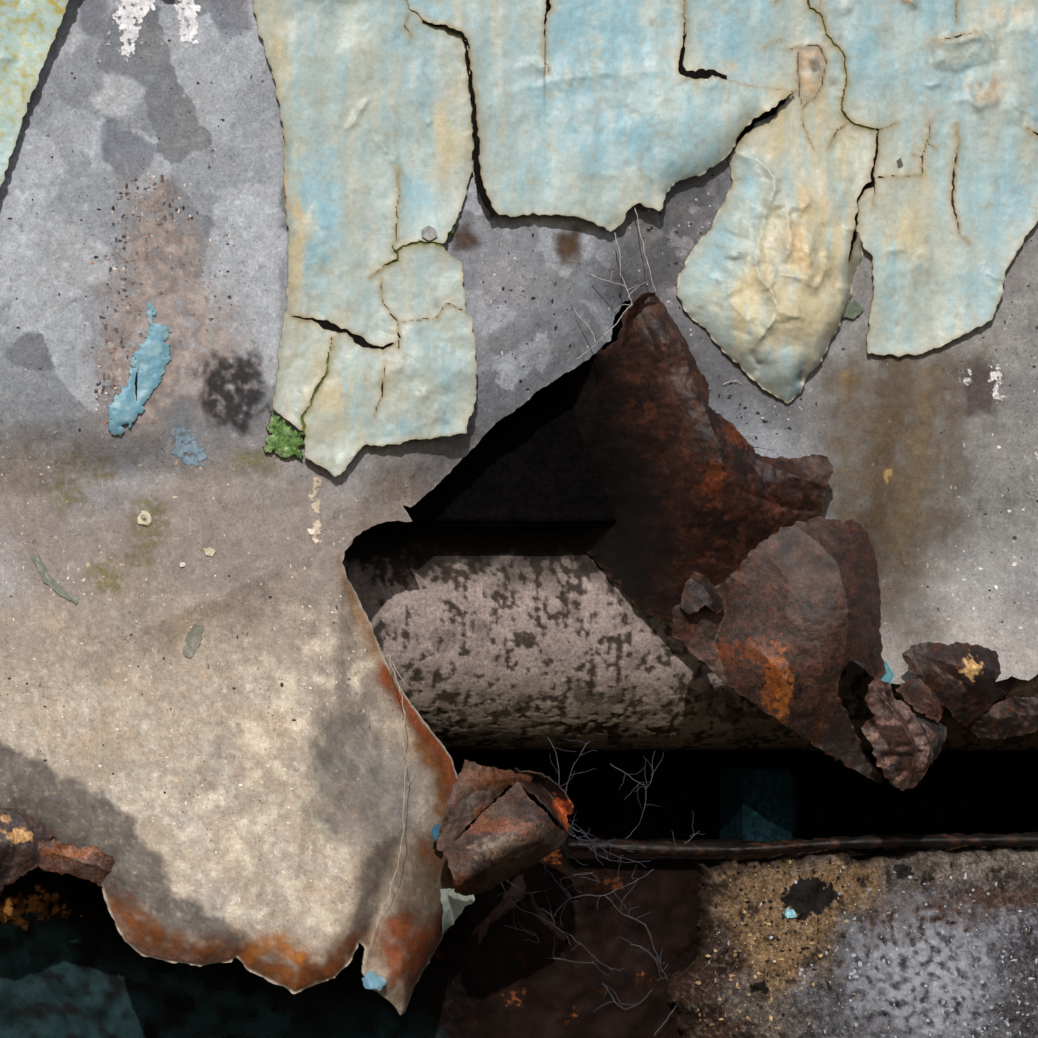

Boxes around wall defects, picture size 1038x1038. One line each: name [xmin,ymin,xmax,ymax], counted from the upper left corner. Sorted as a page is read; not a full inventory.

peeling [0,0,69,187]
crack [404,20,498,218]
crack [678,18,727,80]
crack [736,0,893,261]
peeling [253,0,1038,477]
peeling [108,302,171,435]
crack [293,300,400,435]
damp [827,362,972,607]
corrosion [672,516,886,783]
corrosion [963,695,1038,740]
corrosion [105,876,359,990]
corrosion [380,912,443,1001]